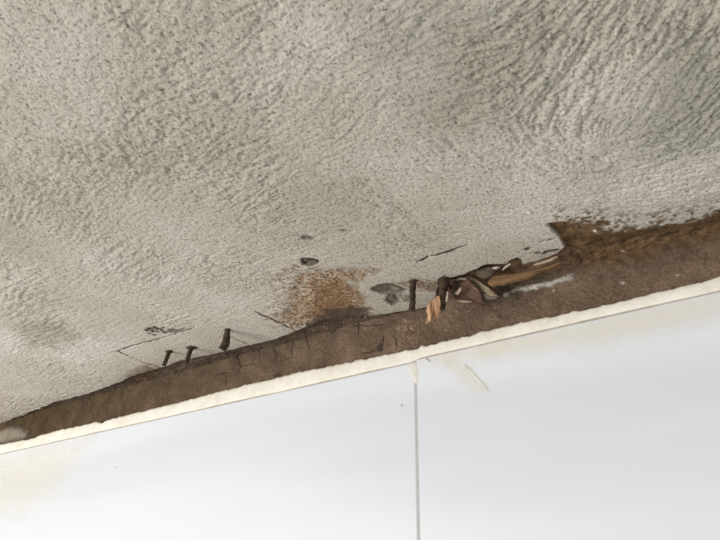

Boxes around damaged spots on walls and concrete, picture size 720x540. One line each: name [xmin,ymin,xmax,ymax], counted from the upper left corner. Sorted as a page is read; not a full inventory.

crack [416,244,468,262]
spalling [448,245,588,300]
corrosion [267,259,379,333]
peeling [371,283,410,305]
crack [115,328,192,367]